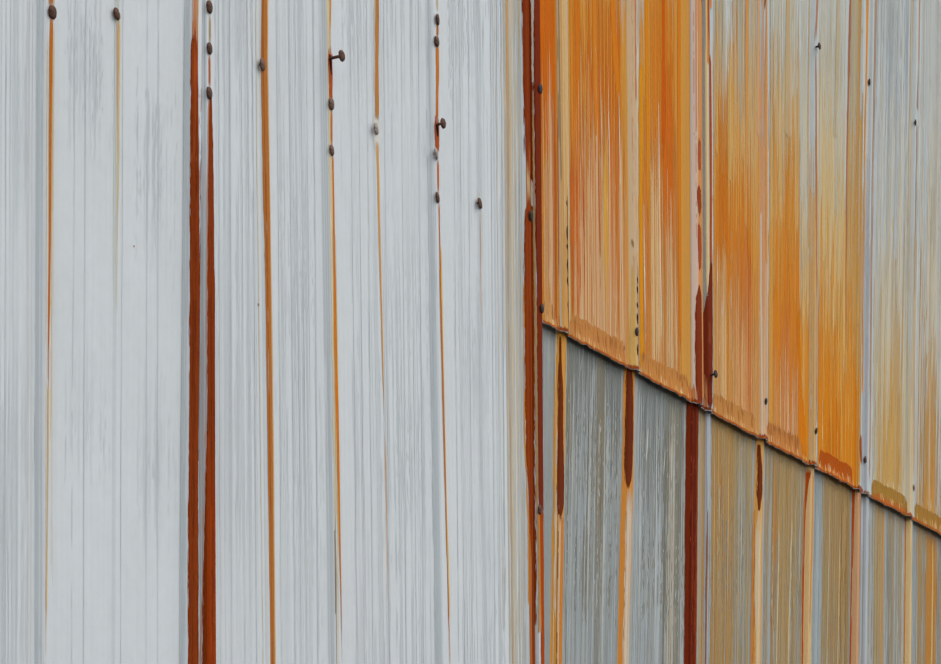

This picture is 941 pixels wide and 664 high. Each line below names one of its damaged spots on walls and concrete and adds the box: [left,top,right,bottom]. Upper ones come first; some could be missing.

rust [46,18,55,636]
rust [187,0,216,664]
rust [256,0,276,664]
rust [326,0,342,624]
rust [434,46,450,648]
rust [495,0,941,664]